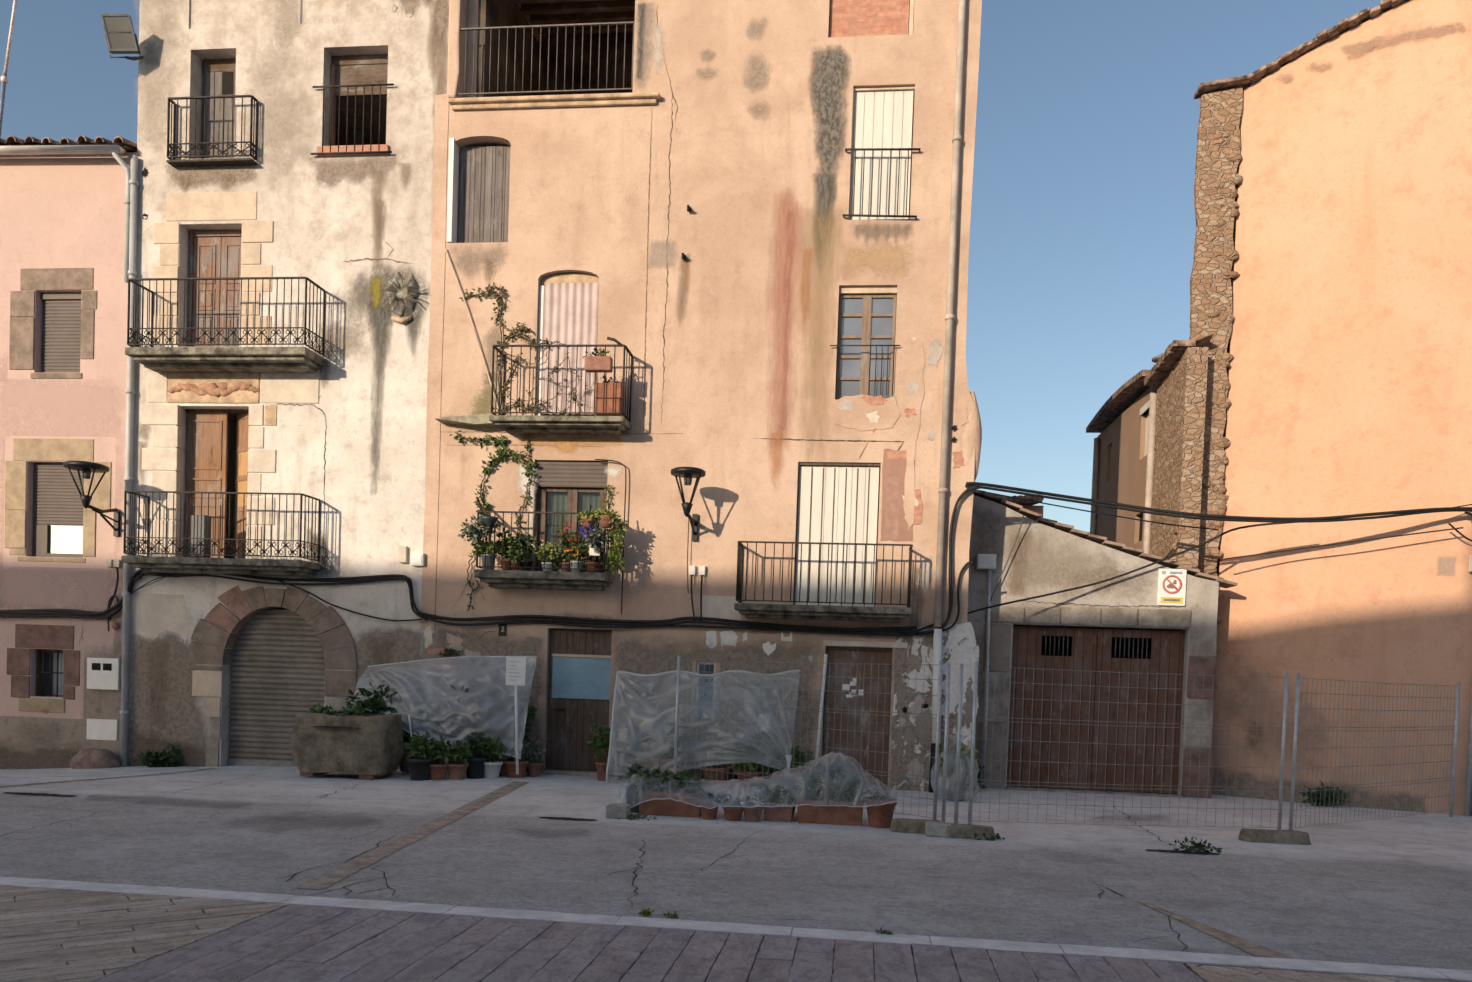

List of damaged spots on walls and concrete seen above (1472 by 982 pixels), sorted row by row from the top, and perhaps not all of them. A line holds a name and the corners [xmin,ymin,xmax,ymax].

leakage [810,47,848,261]
crack [453,7,683,447]
leakage [316,157,427,466]
corrosion [774,198,798,439]
flaking render [827,395,901,432]
flaking render [881,448,915,541]
flaking render [952,450,964,469]
leakage [116,630,208,767]
peeling [706,630,792,655]
flaking render [916,556,935,593]
peeling [890,622,979,794]
crack [275,815,494,895]